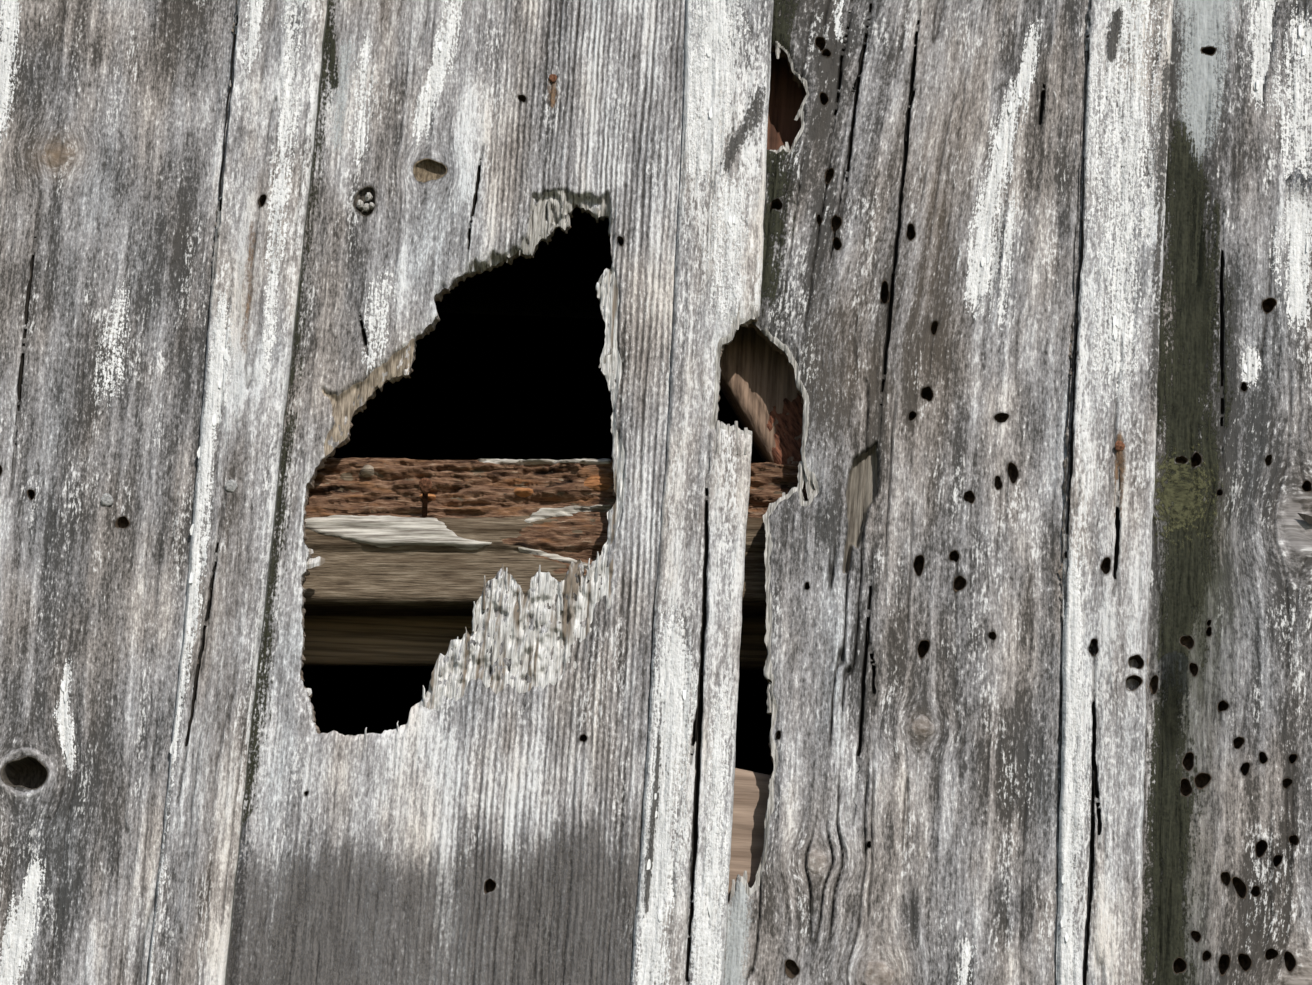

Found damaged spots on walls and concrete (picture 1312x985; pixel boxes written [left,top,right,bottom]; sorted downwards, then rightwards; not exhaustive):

spalling [306,548,325,569]
spalling [318,267,415,466]
spalling [418,270,625,711]
spalling [451,190,613,285]
peeling [631,0,819,985]
crack [1065,2,1091,572]
rust [1114,433,1126,512]
crack [685,435,710,982]
crack [1082,702,1102,985]